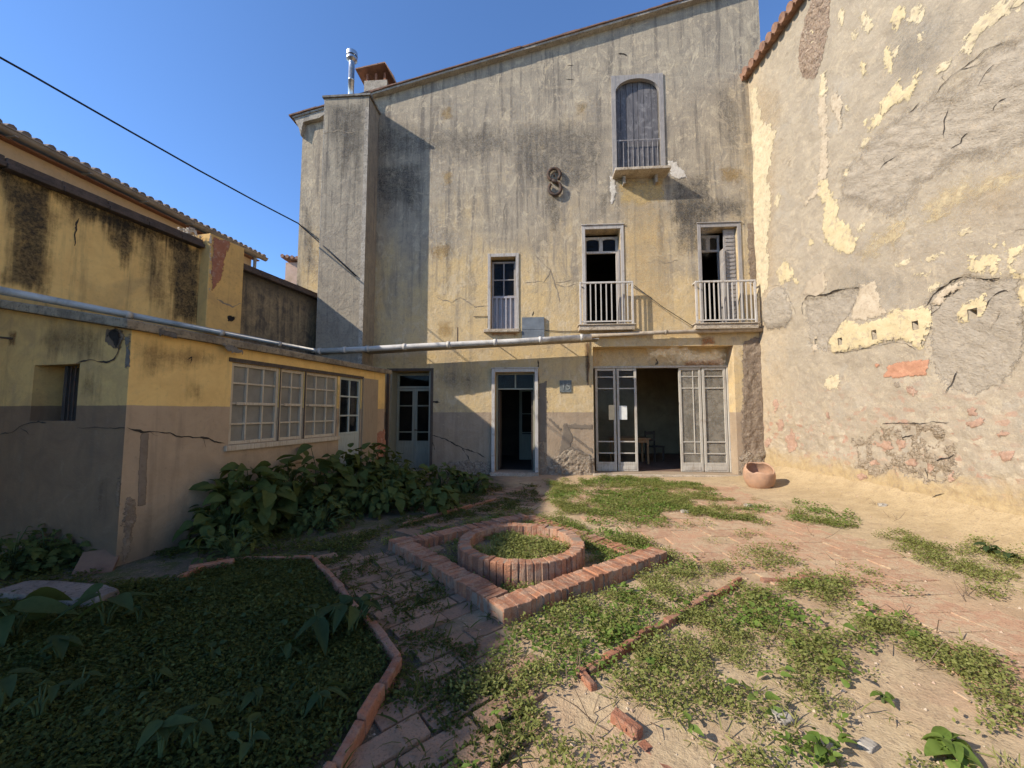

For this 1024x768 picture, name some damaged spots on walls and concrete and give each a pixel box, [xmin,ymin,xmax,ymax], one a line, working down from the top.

spalling [798,0,1024,258]
crack [910,42,1004,148]
peeling [609,161,687,205]
water stain [0,169,198,321]
peeling [209,235,230,290]
spalling [747,85,1024,428]
crack [90,427,240,447]
spalling [851,421,962,485]